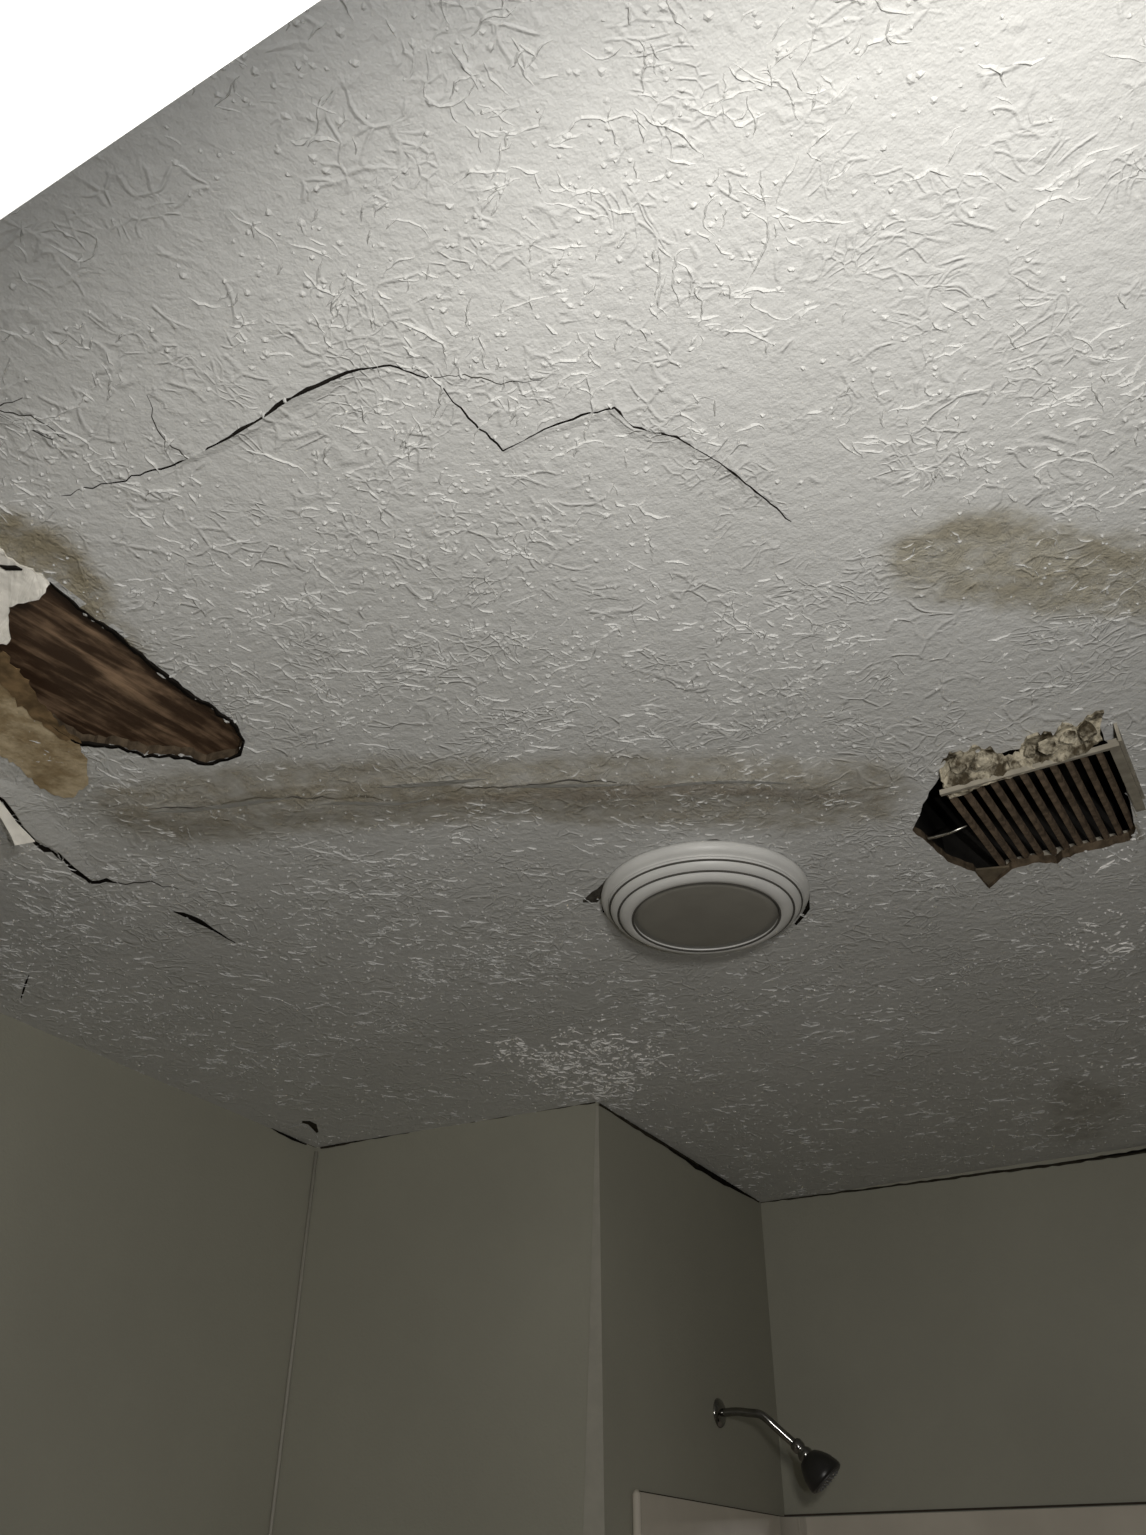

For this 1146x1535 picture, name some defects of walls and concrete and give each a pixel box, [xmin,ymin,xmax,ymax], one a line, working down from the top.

crack [0,398,66,443]
crack [63,364,791,522]
leakage [896,520,1146,610]
peeling [0,548,245,798]
spalling [939,710,1104,799]
crack [0,779,178,889]
spalling [975,865,1009,885]